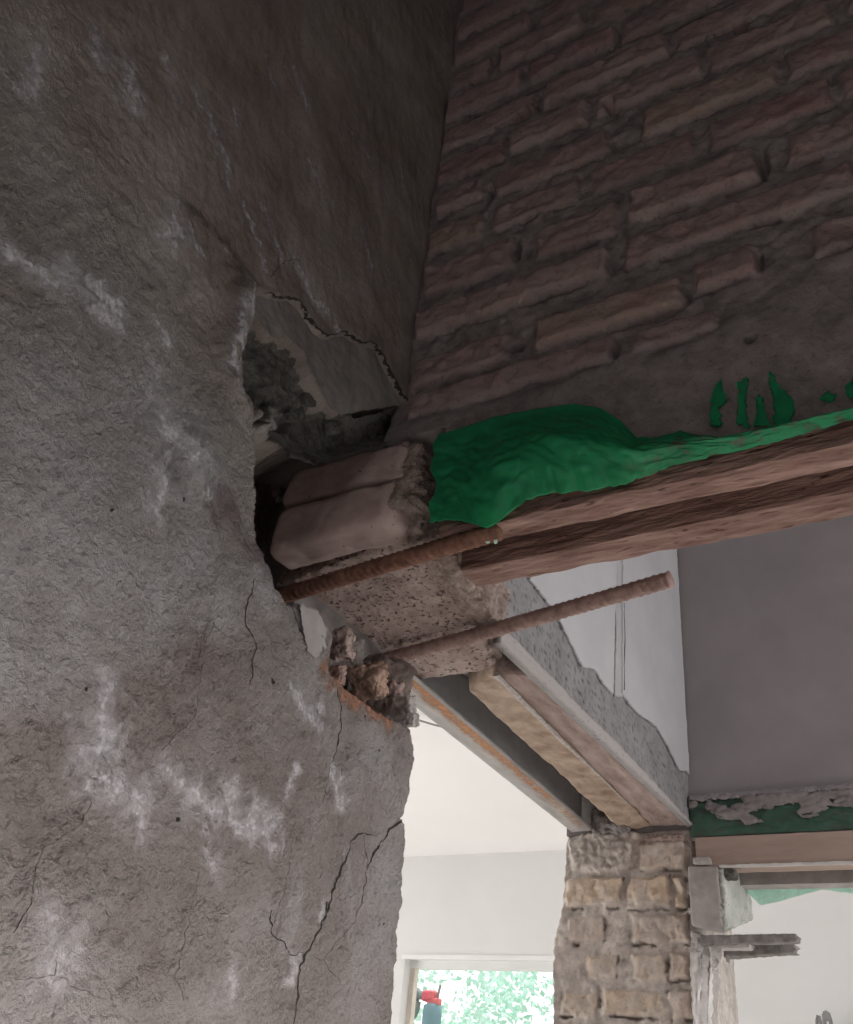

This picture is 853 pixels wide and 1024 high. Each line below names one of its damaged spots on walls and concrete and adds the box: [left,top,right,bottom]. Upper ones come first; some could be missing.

flaking render [242,292,408,465]
spalling [276,524,503,603]
corrosion [320,662,393,729]
peeling [381,549,690,775]
crack [269,819,402,1024]